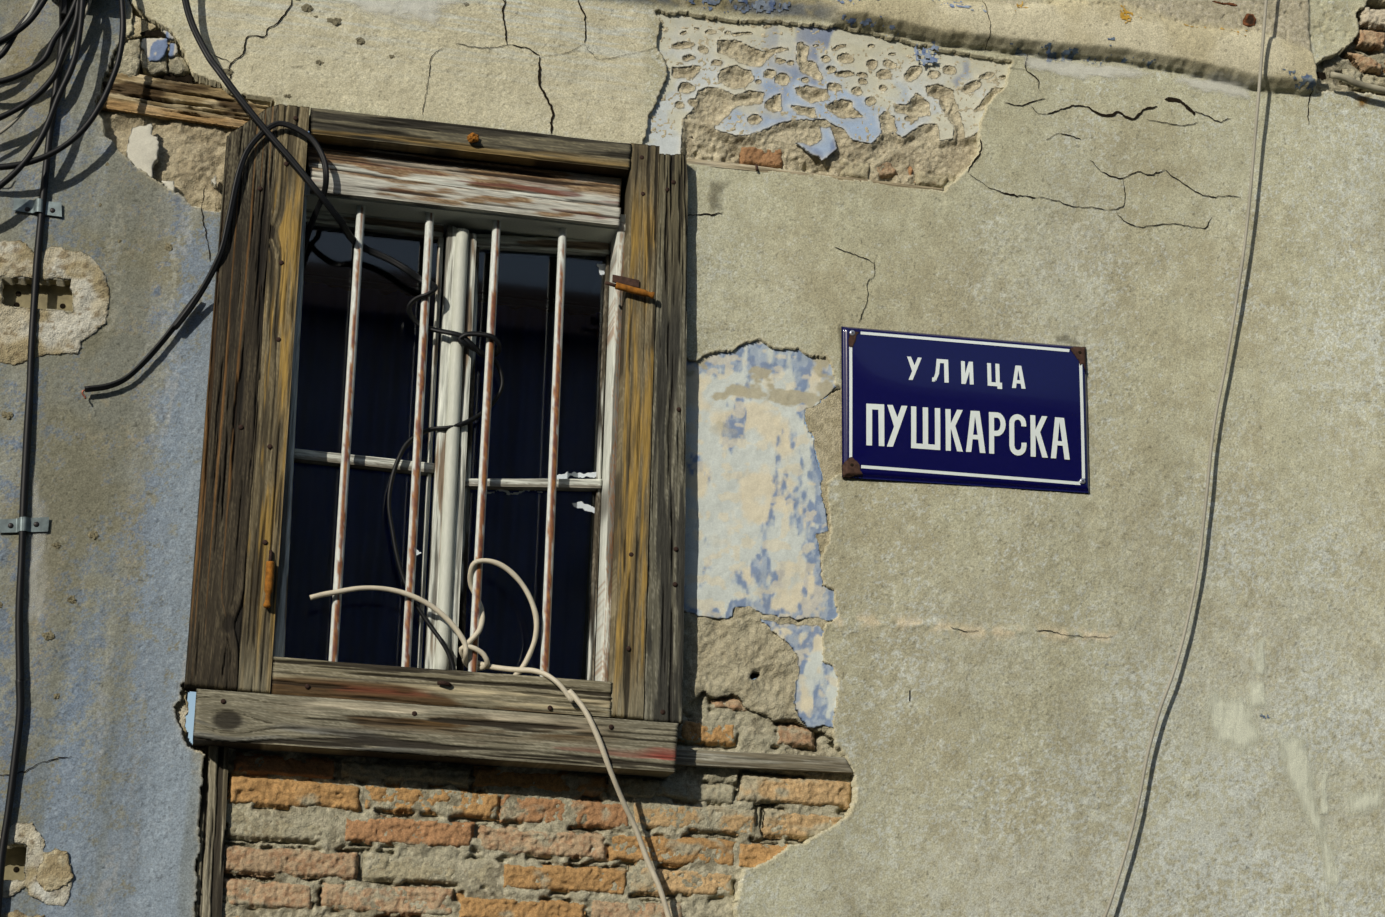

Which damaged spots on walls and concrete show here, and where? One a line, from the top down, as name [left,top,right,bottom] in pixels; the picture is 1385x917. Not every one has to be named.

flaking render [112,12,194,84]
flaking render [99,111,235,212]
crack [213,0,292,79]
crack [422,0,658,134]
flaking render [643,0,1156,188]
crack [968,54,1241,229]
flaking render [1283,0,1385,96]
flaking render [222,339,852,917]
peeling [36,848,74,891]